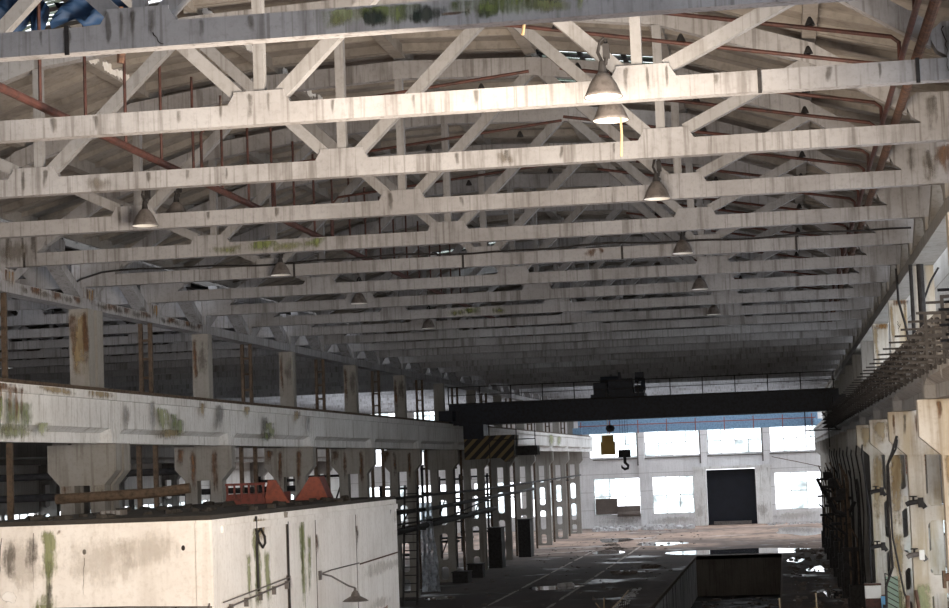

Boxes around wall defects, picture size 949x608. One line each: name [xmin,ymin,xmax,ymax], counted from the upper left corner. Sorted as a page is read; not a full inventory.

leakage [330,5,420,25]
leakage [452,0,564,13]
rust [5,270,201,372]
leakage [0,397,48,435]
leakage [151,403,182,438]
leakage [4,548,15,574]
leakage [29,533,56,608]
leakage [247,519,271,603]
leakage [299,523,311,604]